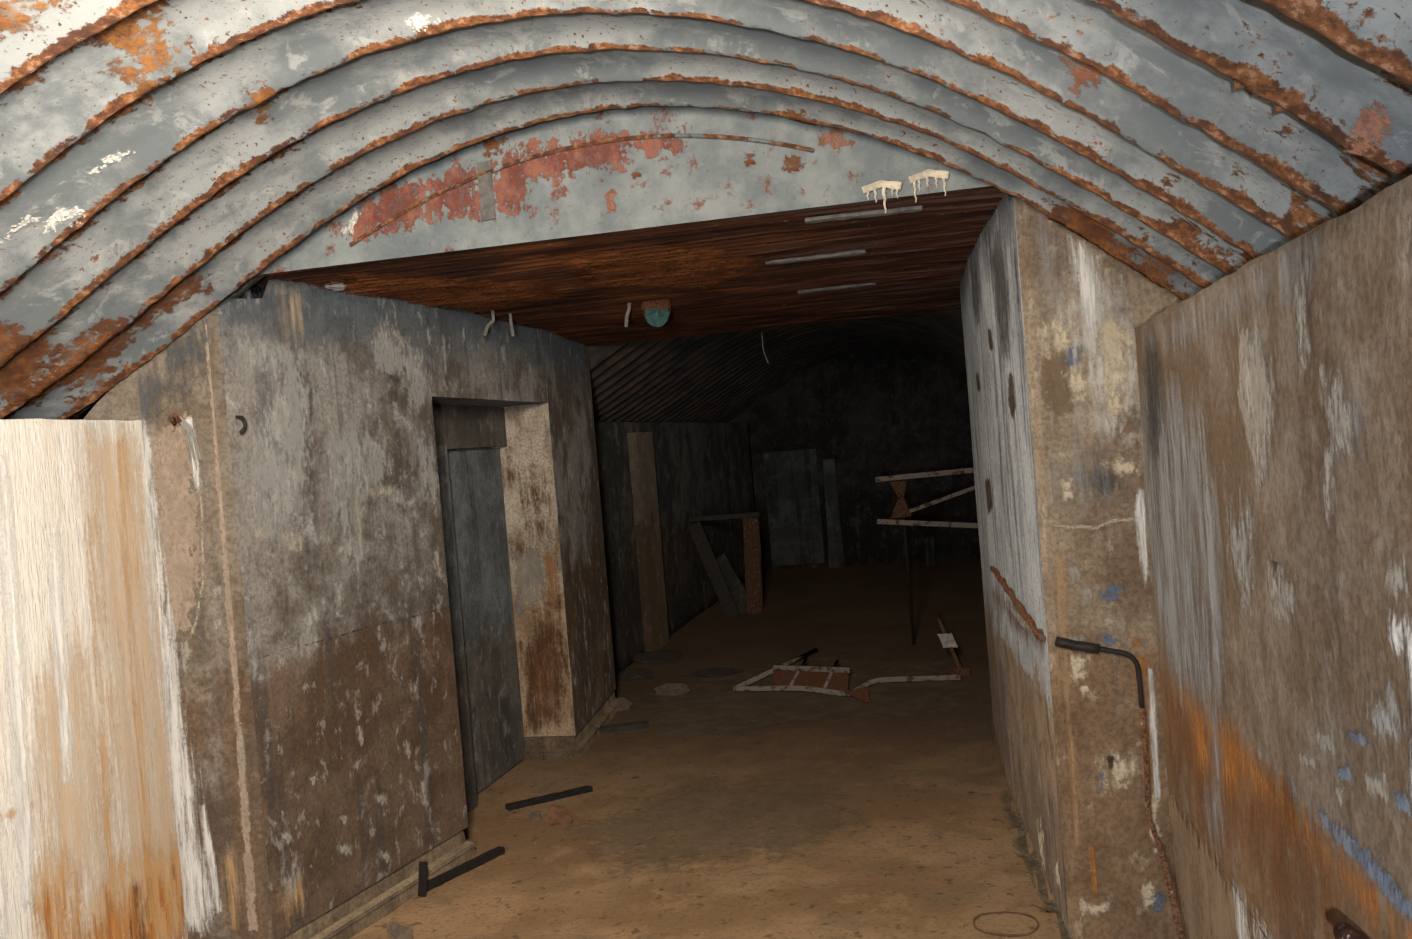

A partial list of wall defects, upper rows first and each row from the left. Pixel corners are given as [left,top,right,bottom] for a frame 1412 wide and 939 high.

corrosion [0,0,73,39]
corrosion [100,6,196,95]
corrosion [245,81,275,124]
corrosion [605,189,618,214]
corrosion [781,155,804,173]
corrosion [762,109,856,152]
corrosion [1346,100,1394,157]
corrosion [0,269,214,407]
corrosion [502,456,550,536]
corrosion [519,555,570,733]
corrosion [33,432,186,939]
corrosion [1177,685,1392,927]